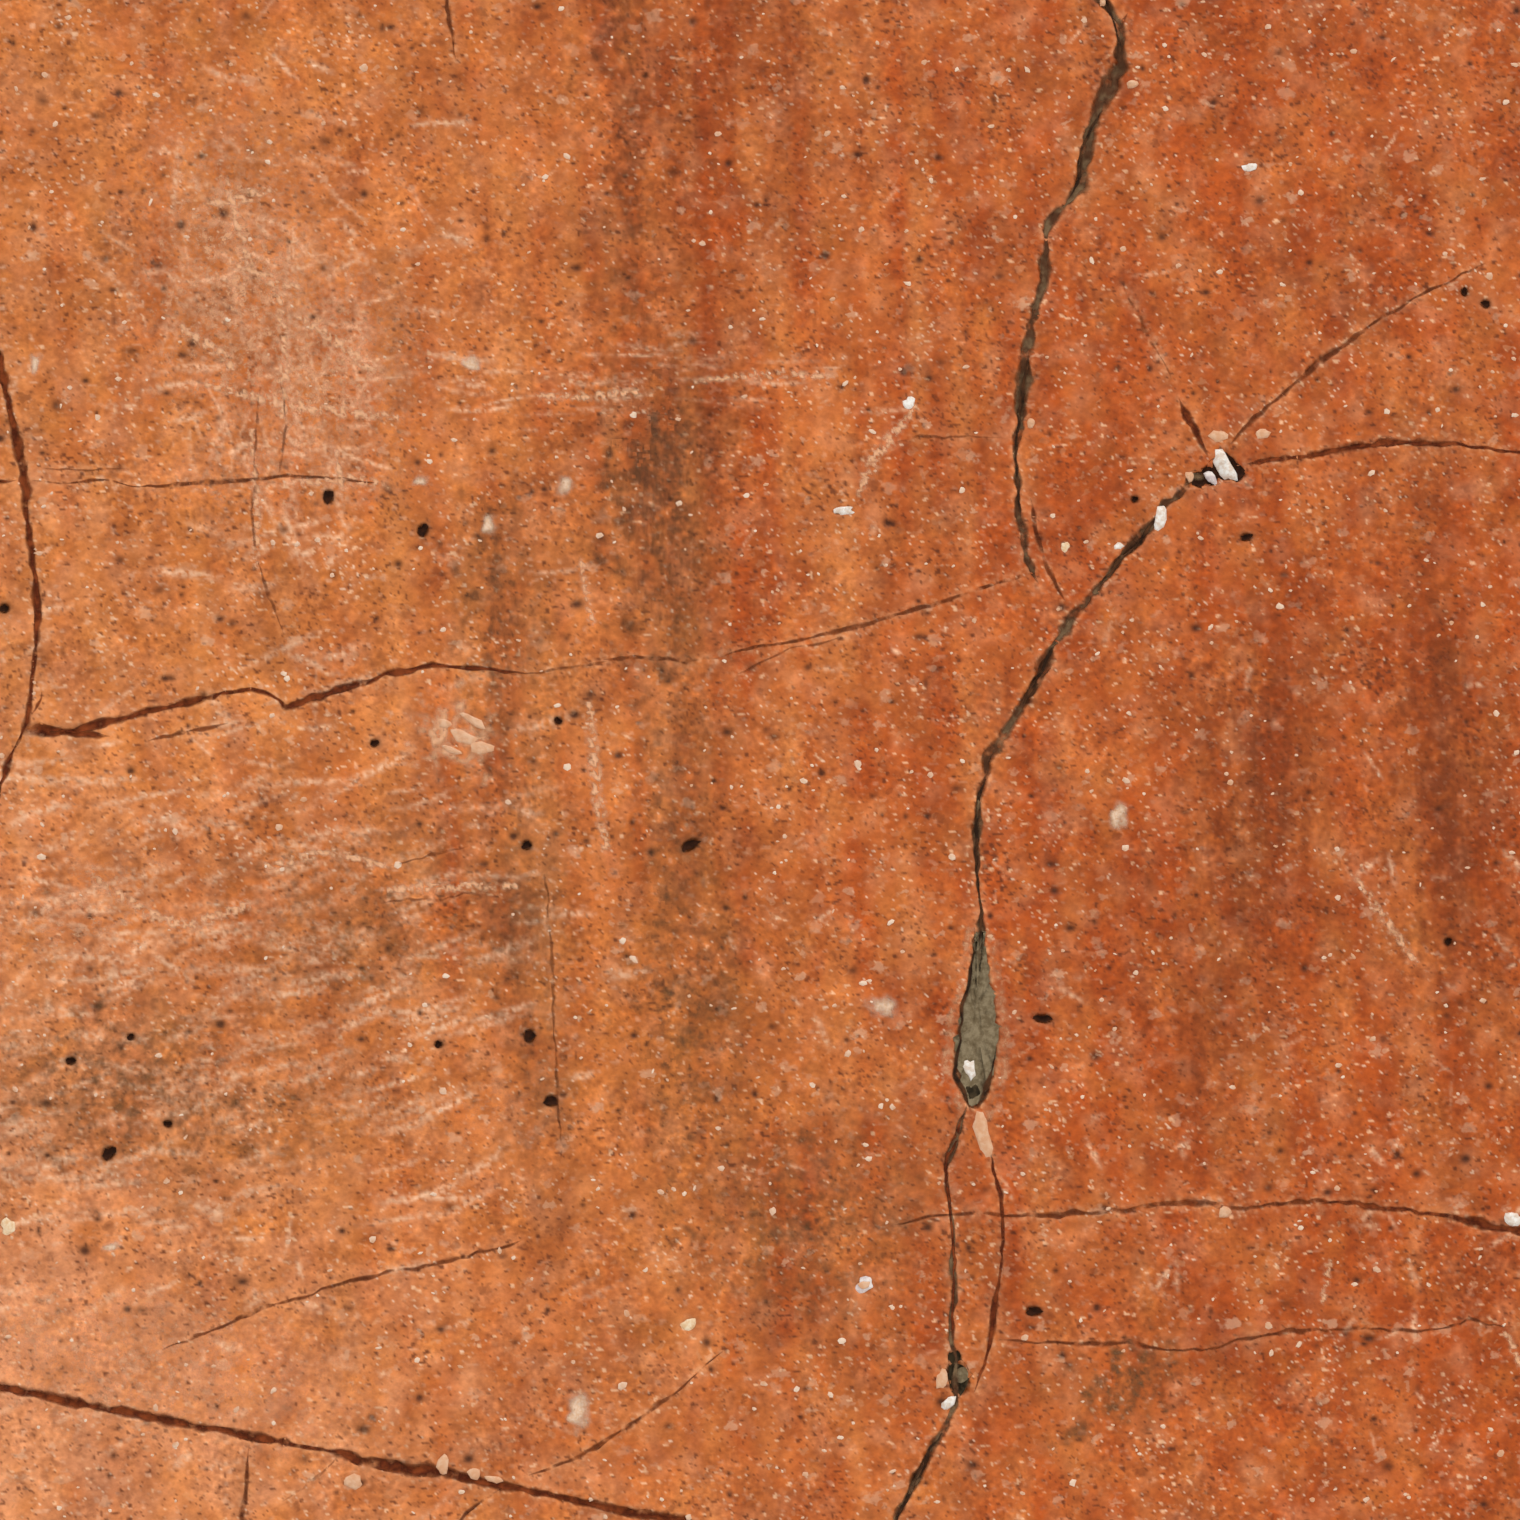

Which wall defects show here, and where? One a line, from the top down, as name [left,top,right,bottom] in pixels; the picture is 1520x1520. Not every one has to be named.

crack [445,0,454,49]
crack [0,352,517,793]
crack [611,654,677,662]
crack [734,0,1520,949]
spalling [943,928,1009,1157]
crack [170,1243,514,1346]
crack [893,1109,1520,1520]
crack [0,1356,716,1520]